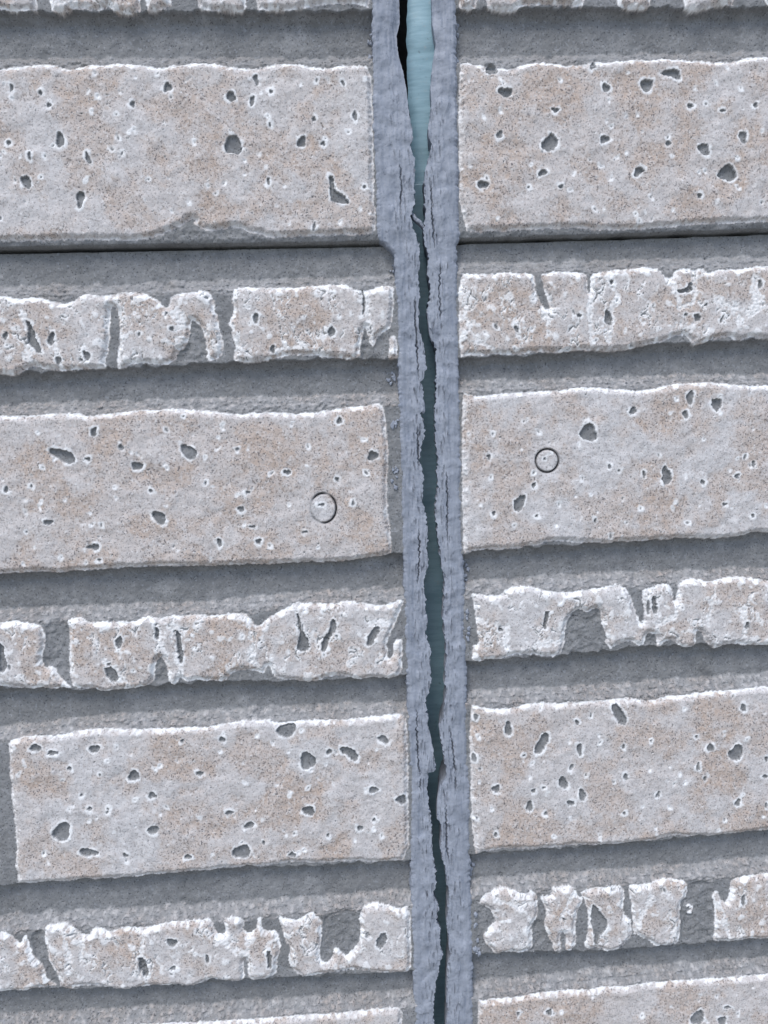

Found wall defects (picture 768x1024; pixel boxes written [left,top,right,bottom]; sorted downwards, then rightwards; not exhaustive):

crack [393,0,457,1024]